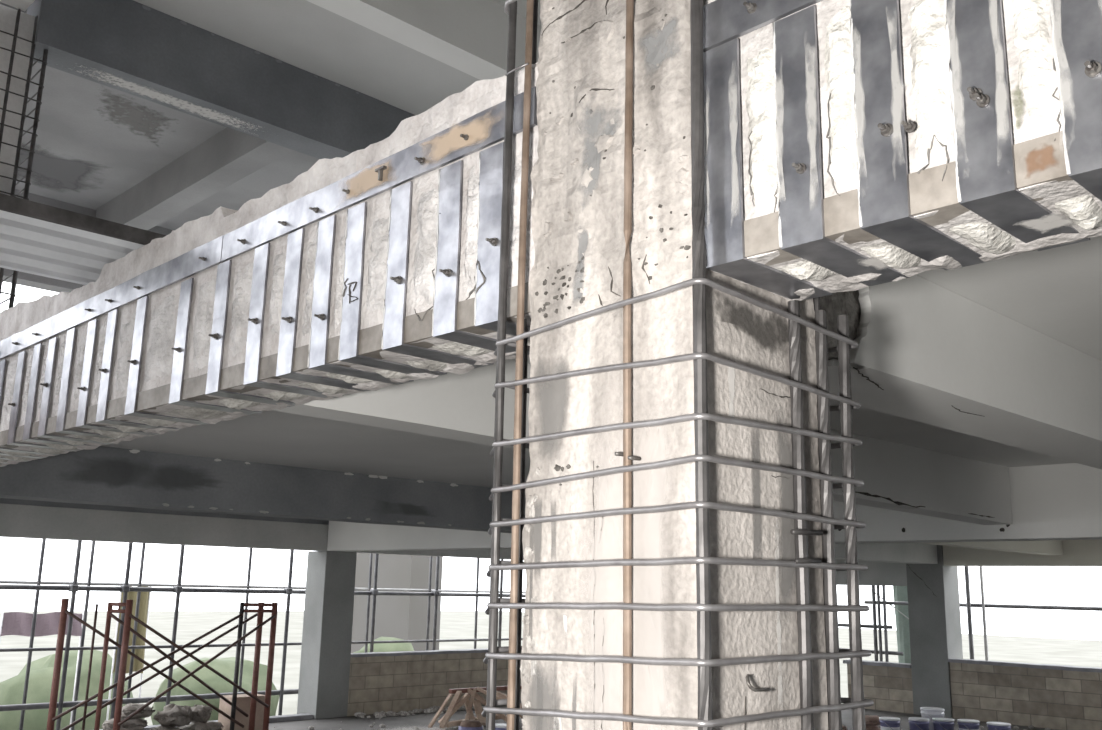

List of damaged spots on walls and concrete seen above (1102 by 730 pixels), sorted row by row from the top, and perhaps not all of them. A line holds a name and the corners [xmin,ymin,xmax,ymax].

water stain [89,71,253,128]
crack [853,367,884,390]
spalling [788,300,814,730]
spalling [813,297,866,730]
crack [855,491,925,508]